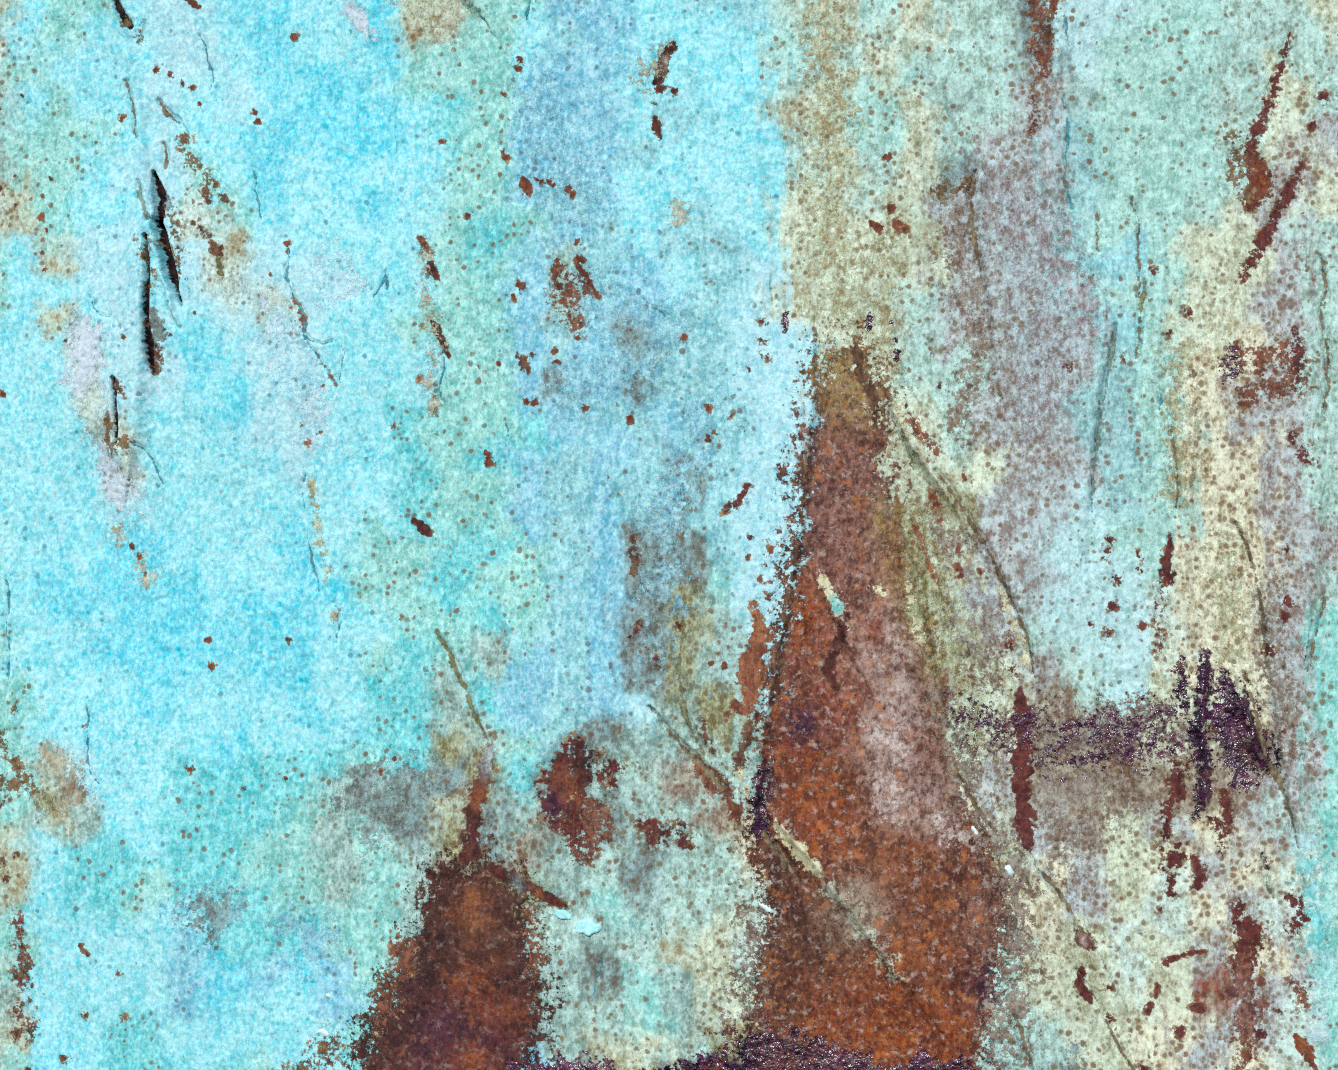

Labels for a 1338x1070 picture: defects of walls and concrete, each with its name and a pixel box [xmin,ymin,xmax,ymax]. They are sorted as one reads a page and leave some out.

crack [115,0,146,45]
rust [1023,0,1064,139]
rust [1213,32,1312,286]
crack [91,82,262,484]
rust [544,238,604,341]
rust [411,517,434,537]
rust [0,704,38,808]
rust [523,722,699,871]
rust [642,309,1287,1070]
rust [4,909,45,1049]
rust [267,739,616,1070]
rust [1162,886,1318,1070]